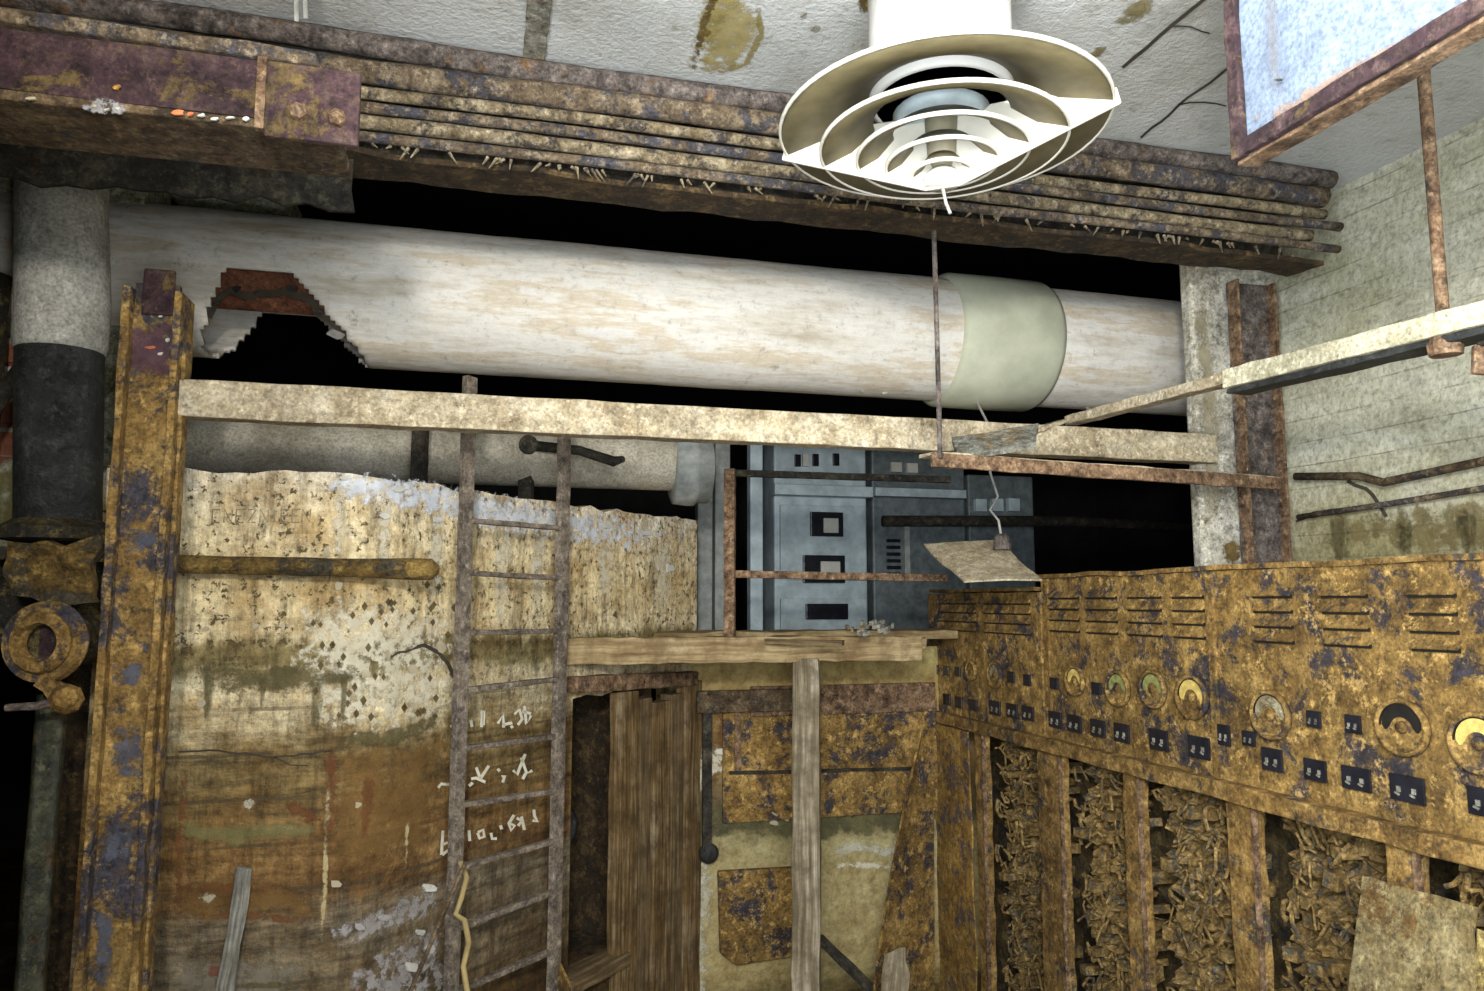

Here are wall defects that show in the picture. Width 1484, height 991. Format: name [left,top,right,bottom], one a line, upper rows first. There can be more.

leakage [692,0,764,73]
rust [131,315,171,375]
leakage [1323,502,1484,560]
rust [113,664,141,686]
leakage [200,665,353,726]
rust [113,727,143,778]
rust [96,913,113,987]